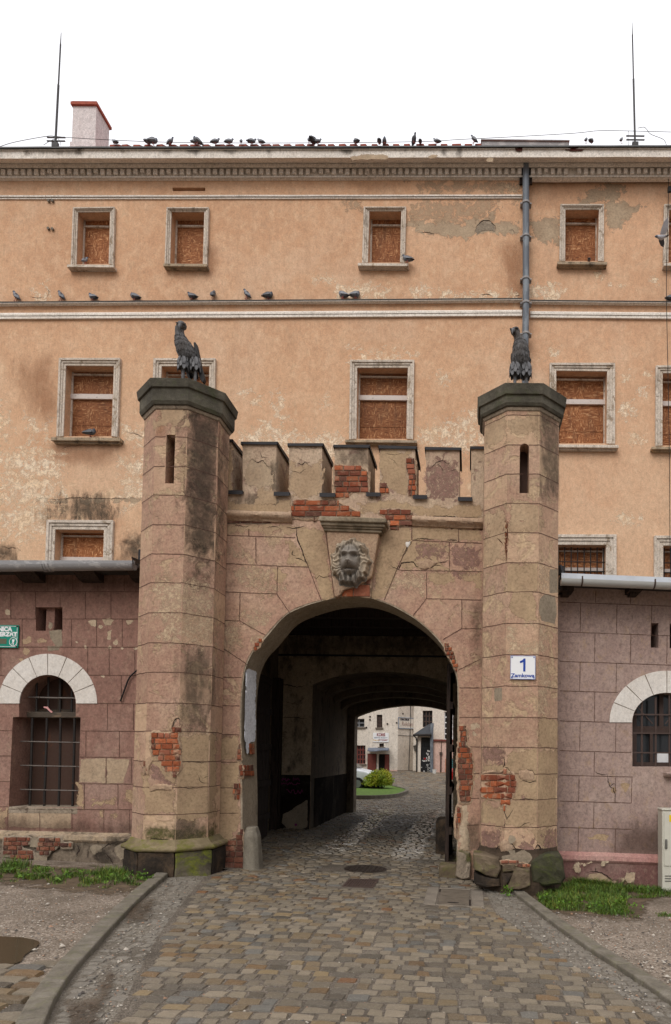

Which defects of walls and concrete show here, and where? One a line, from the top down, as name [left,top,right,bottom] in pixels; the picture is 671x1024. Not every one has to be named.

peeling [403,180,560,246]
peeling [578,182,647,233]
damp [60,498,108,520]
damp [187,413,221,550]
crack [235,525,325,578]
peeling [213,388,558,656]
peeling [76,702,255,870]
peeling [454,715,558,868]
flaking render [0,807,73,861]